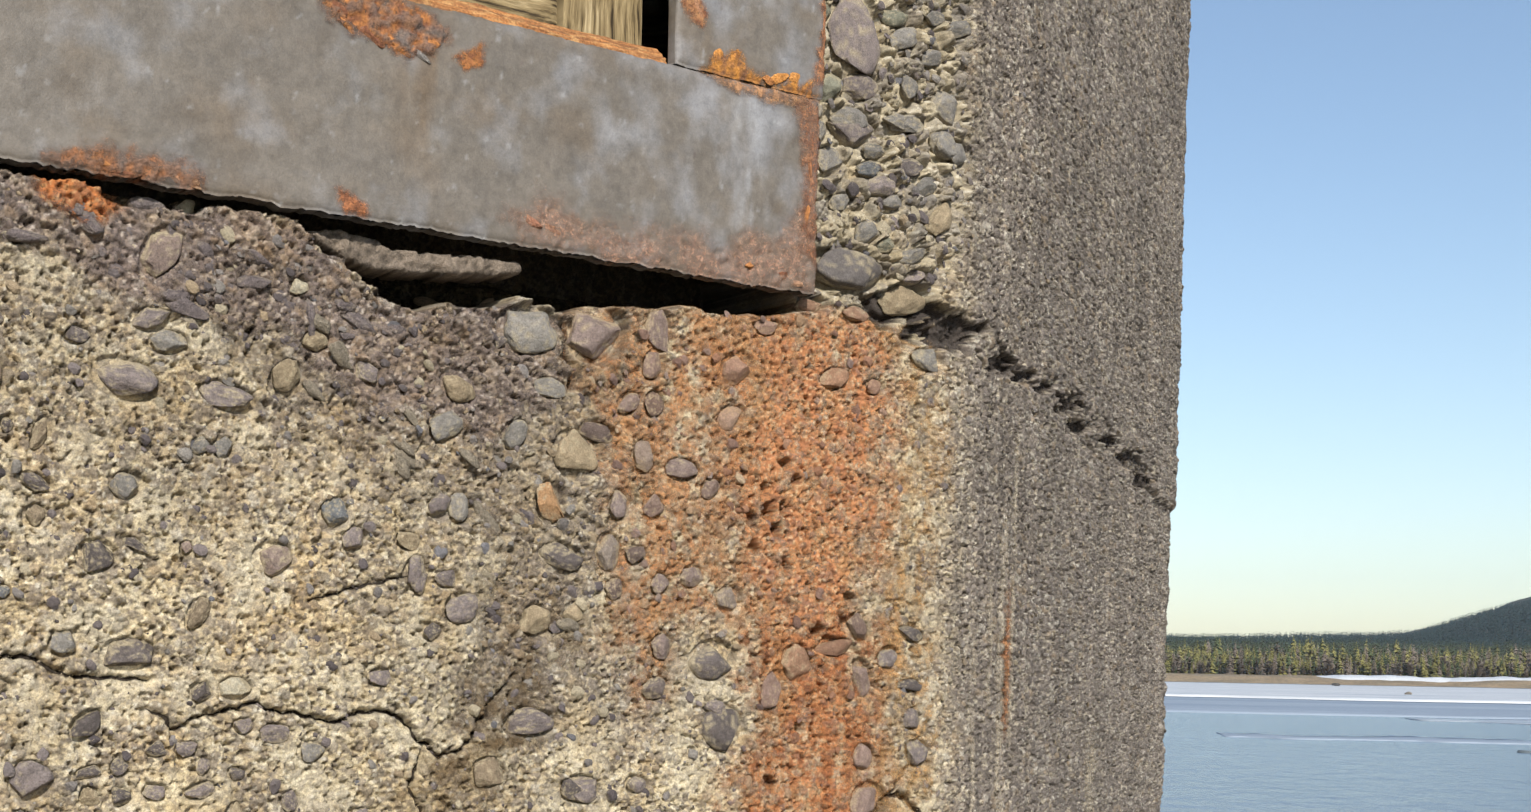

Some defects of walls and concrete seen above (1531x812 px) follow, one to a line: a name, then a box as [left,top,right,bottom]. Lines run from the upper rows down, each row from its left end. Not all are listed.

corrosion [322,0,484,70]
corrosion [36,145,206,220]
corrosion [338,189,368,216]
corrosion [518,0,827,291]
spalling [0,170,648,717]
crack [308,576,407,601]
corrosion [592,305,946,812]
crack [0,653,506,812]
crack [870,764,921,812]